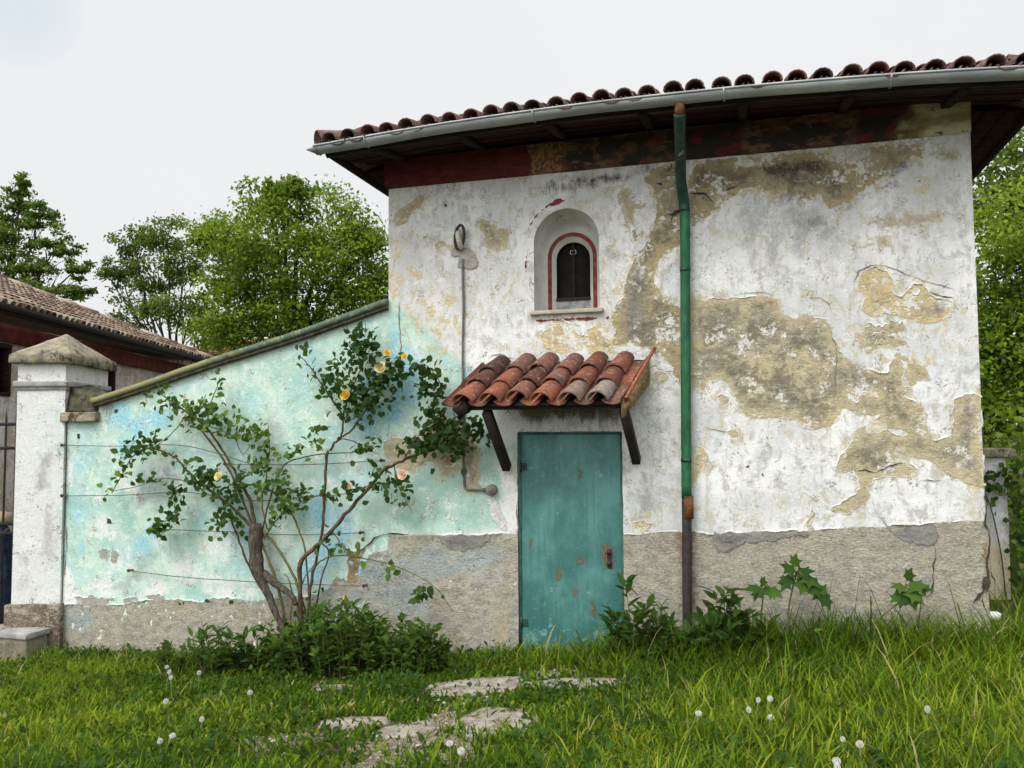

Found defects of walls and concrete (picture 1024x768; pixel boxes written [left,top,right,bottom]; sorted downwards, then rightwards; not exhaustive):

peeling [690,156,763,174]
peeling [536,170,743,411]
crack [855,463,952,482]
peeling [757,452,920,532]
peeling [442,514,507,536]
peeling [623,520,744,535]
spalling [331,542,372,584]
peeling [64,594,237,606]